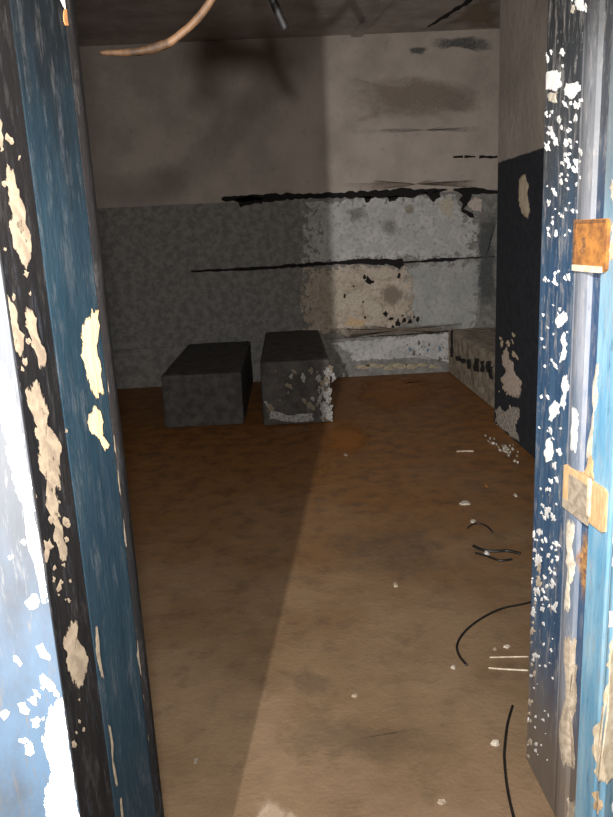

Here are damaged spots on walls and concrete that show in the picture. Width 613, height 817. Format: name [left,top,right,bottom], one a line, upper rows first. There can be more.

crack [427,0,473,27]
peeling [2,164,32,277]
peeling [8,293,46,372]
peeling [0,364,72,610]
peeling [81,310,116,452]
crack [191,256,495,272]
crack [221,187,498,219]
spalling [299,193,522,463]
peeling [544,48,583,237]
peeling [538,363,599,493]
peeling [63,620,104,688]
peeling [530,519,576,677]